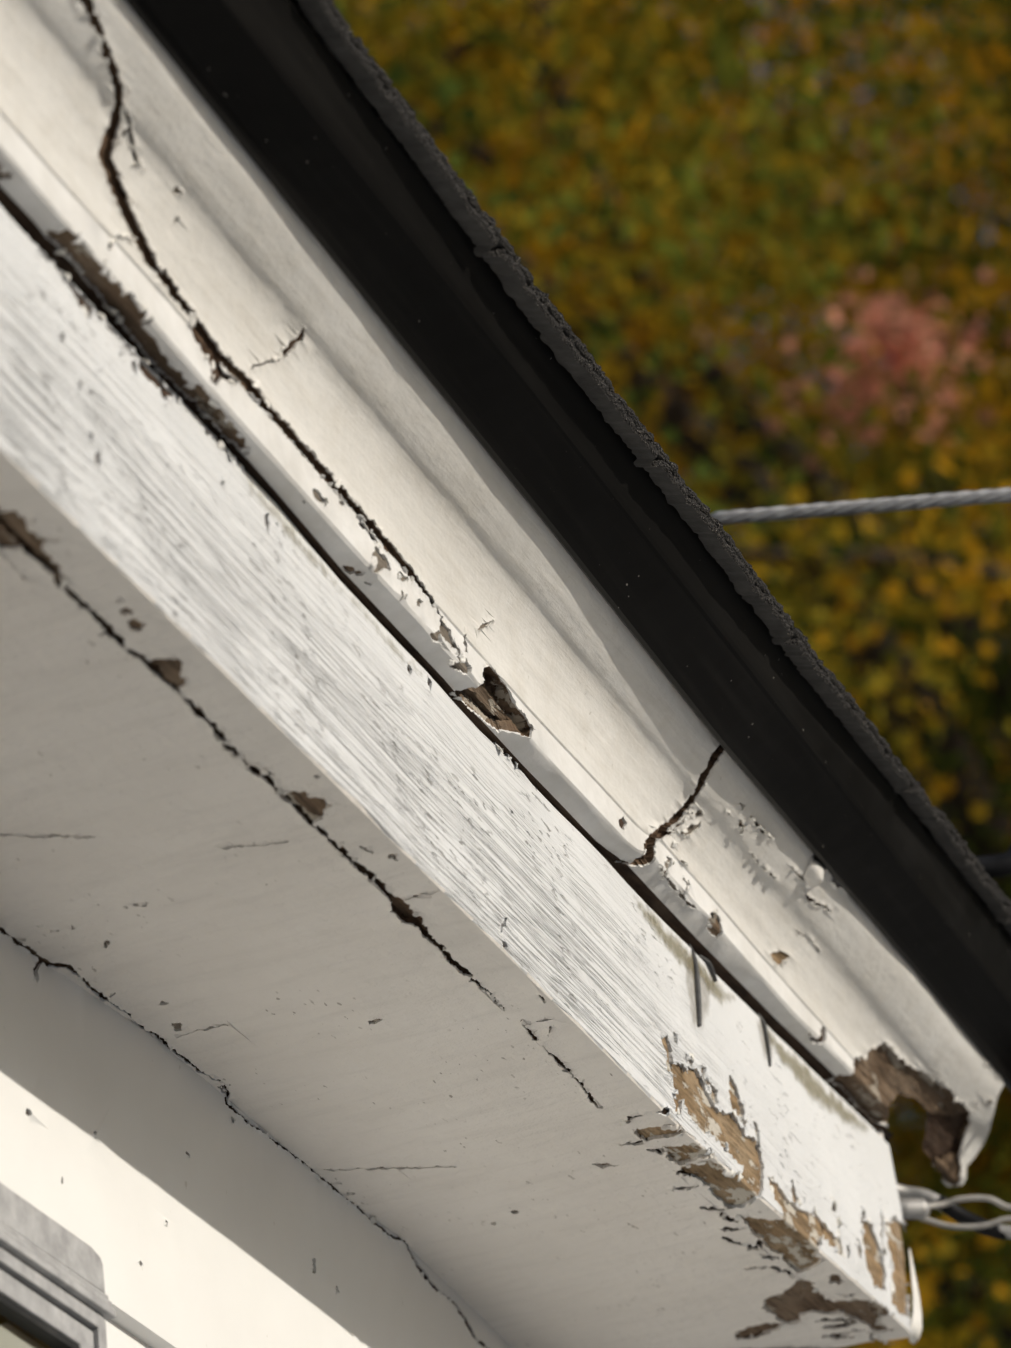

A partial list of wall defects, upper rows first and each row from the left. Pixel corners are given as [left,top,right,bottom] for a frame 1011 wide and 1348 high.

peeling [0,164,16,180]
peeling [24,228,251,467]
crack [79,0,443,619]
crack [0,511,672,1124]
crack [616,745,844,953]
crack [0,927,488,1348]
peeling [619,1032,922,1344]
peeling [807,1026,827,1045]